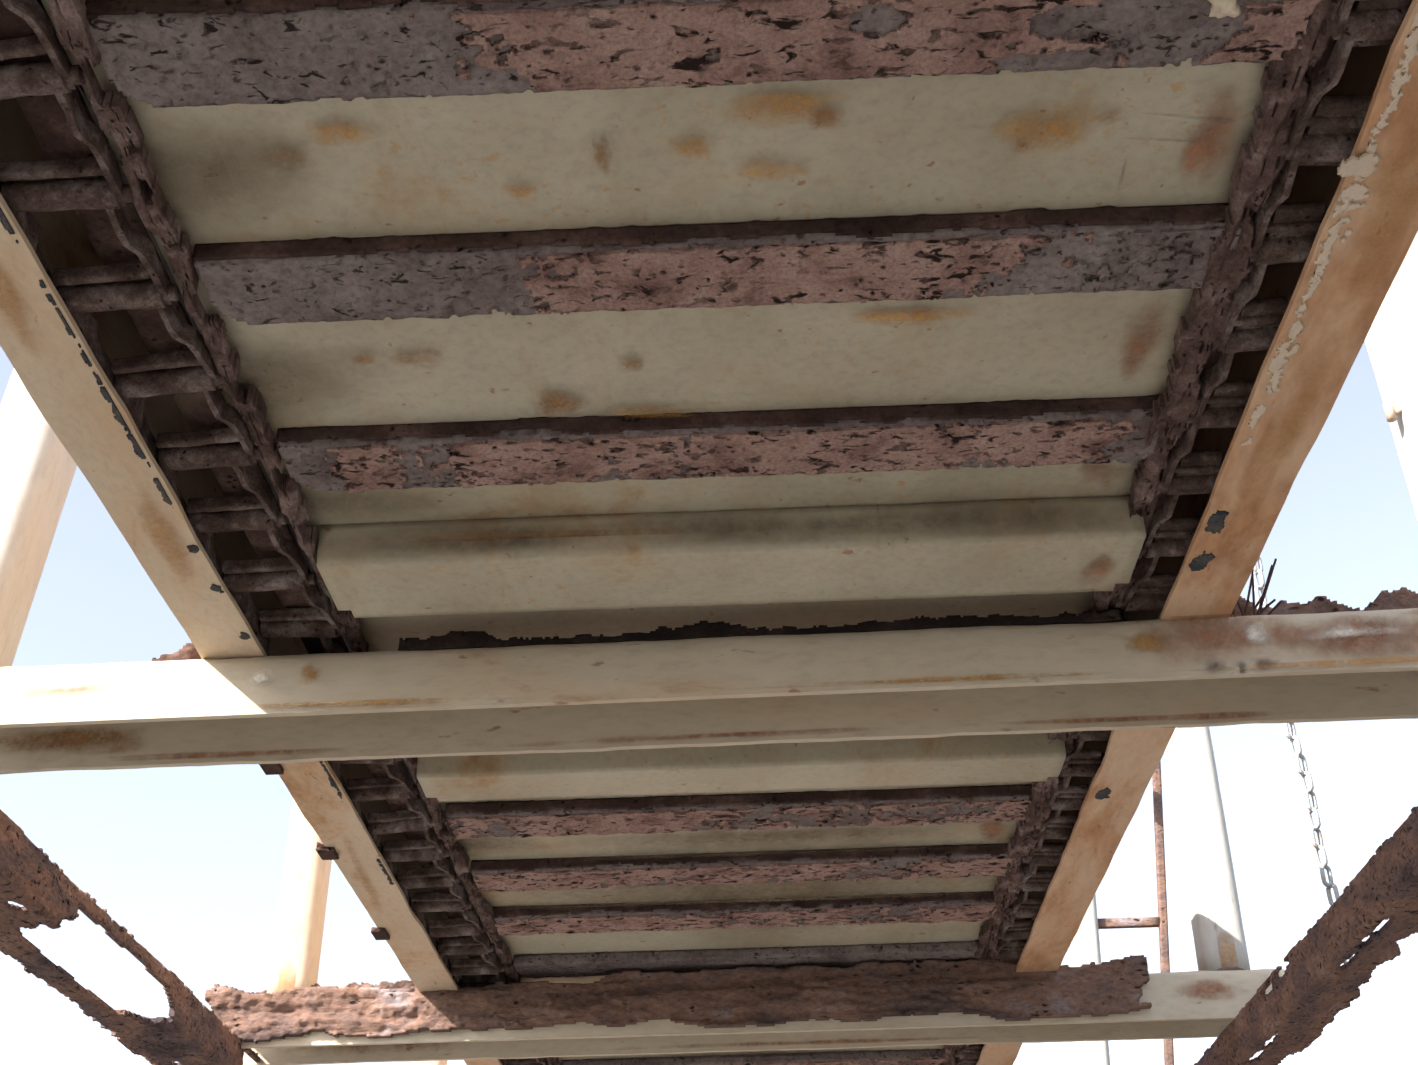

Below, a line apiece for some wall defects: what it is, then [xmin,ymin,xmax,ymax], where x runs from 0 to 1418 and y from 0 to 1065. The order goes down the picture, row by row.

peeling [0,207,19,244]
peeling [1240,8,1418,446]
peeling [39,280,172,506]
corrosion [1054,713,1245,723]
corrosion [0,730,123,749]
corrosion [160,750,299,775]
peeling [319,761,342,799]
corrosion [315,842,339,860]
corrosion [371,927,390,940]
peeling [205,955,1152,1044]
corrosion [1194,982,1226,997]